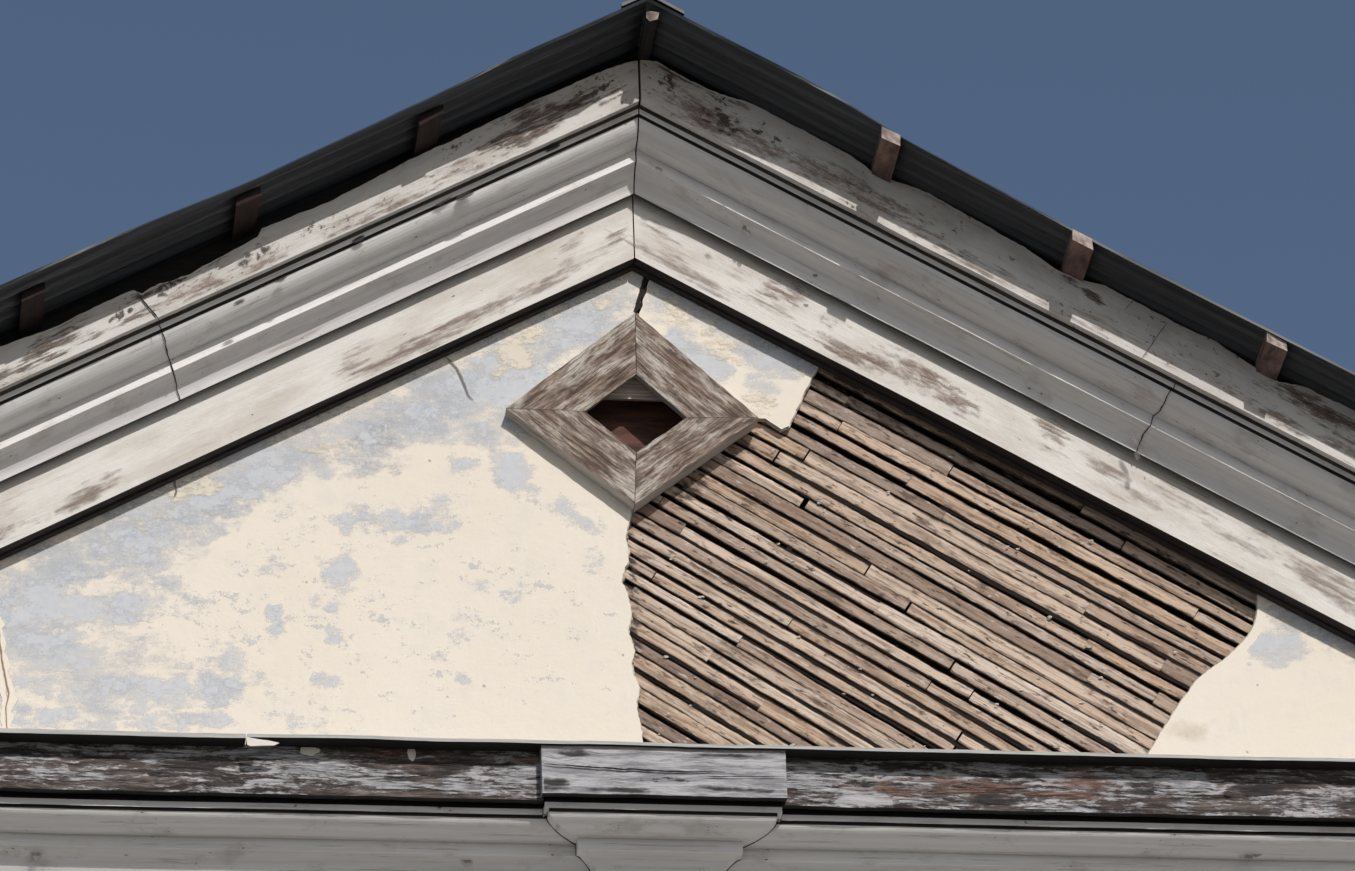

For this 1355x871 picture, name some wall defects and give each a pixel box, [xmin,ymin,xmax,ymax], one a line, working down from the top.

peeling [297,74,627,243]
peeling [647,73,960,261]
peeling [0,243,283,385]
crack [137,292,181,401]
crack [1133,384,1175,453]
flaking render [0,277,1355,812]
crack [0,617,17,728]